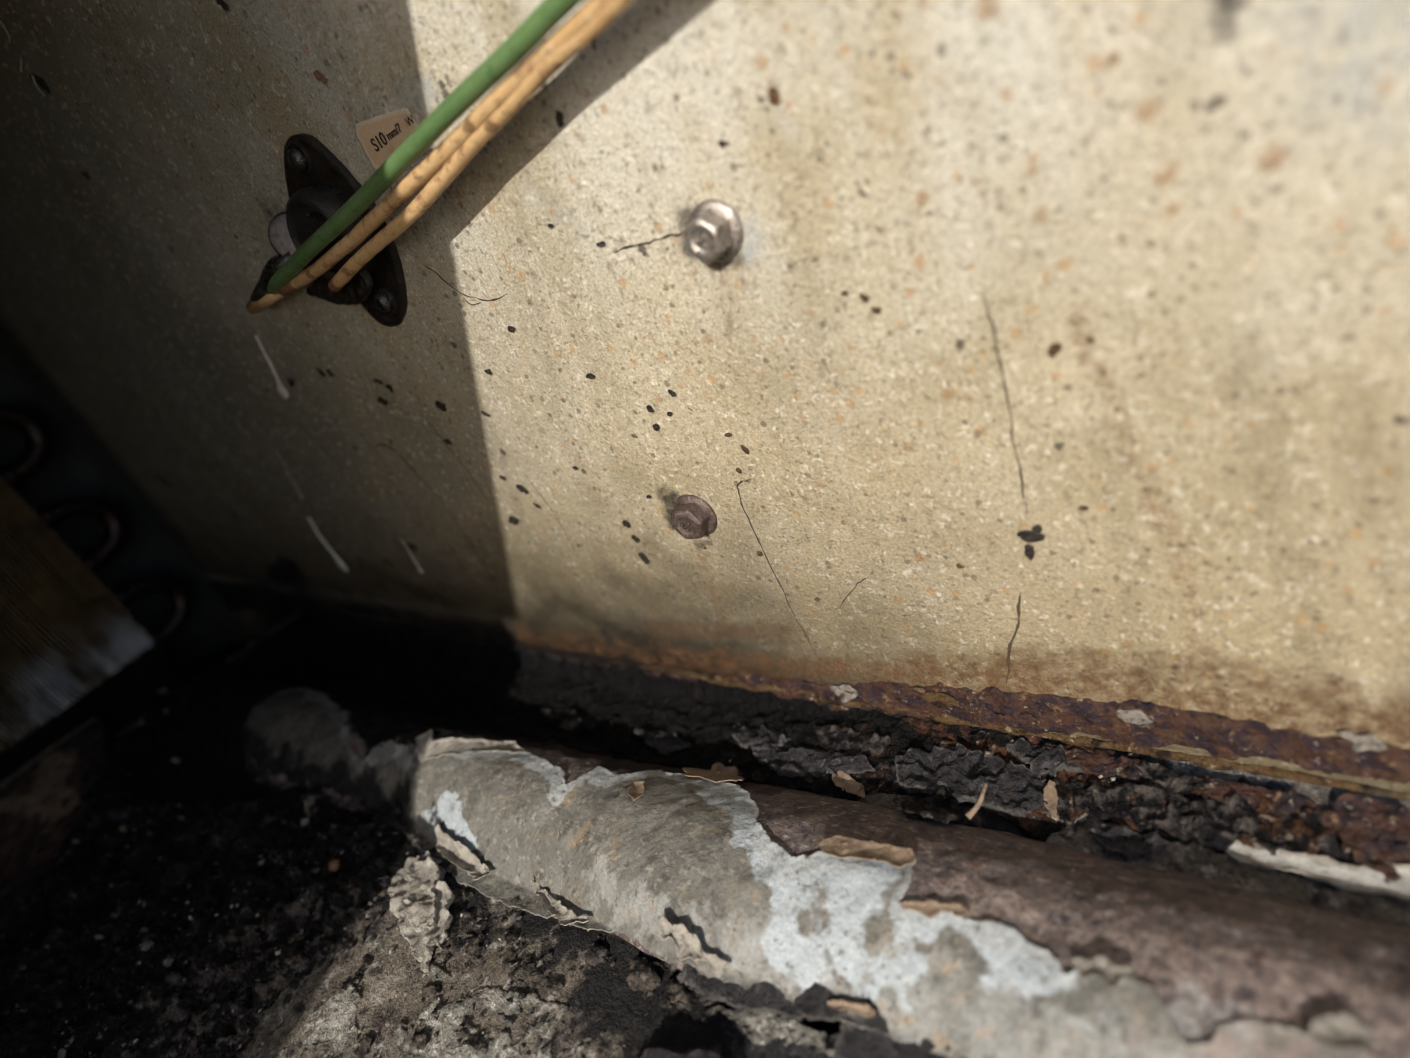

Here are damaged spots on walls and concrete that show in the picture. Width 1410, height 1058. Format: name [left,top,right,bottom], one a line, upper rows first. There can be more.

crack [981,291,1028,516]
crack [737,479,819,661]
corrosion [517,627,1410,783]
crack [1006,592,1021,684]
peeling [242,609,1410,1058]